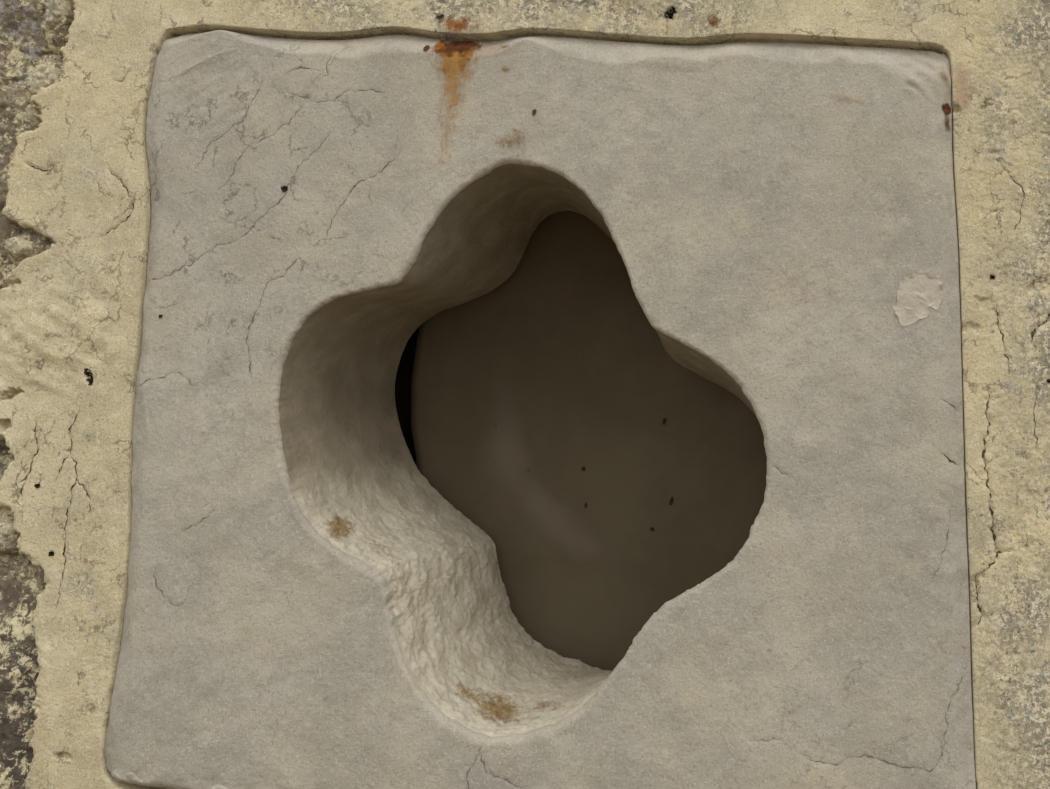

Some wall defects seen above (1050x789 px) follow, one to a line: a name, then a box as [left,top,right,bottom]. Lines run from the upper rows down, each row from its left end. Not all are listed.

corrosion [423,18,476,105]
crack [197,52,384,190]
crack [151,138,326,280]
crack [325,158,396,241]
crack [246,259,297,373]
peeling [892,270,945,326]
crack [1031,314,1050,341]
crack [802,675,966,772]
crack [466,747,522,789]